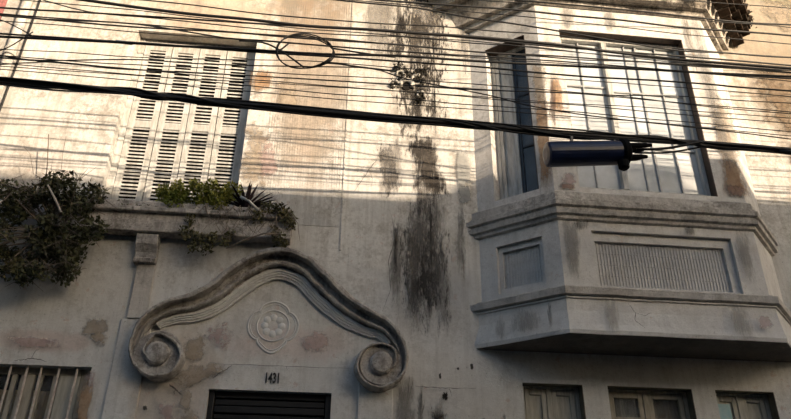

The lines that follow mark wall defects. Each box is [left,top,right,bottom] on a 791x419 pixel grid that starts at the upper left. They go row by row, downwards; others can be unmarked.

leakage [369,0,464,332]
flaking render [756,64,791,131]